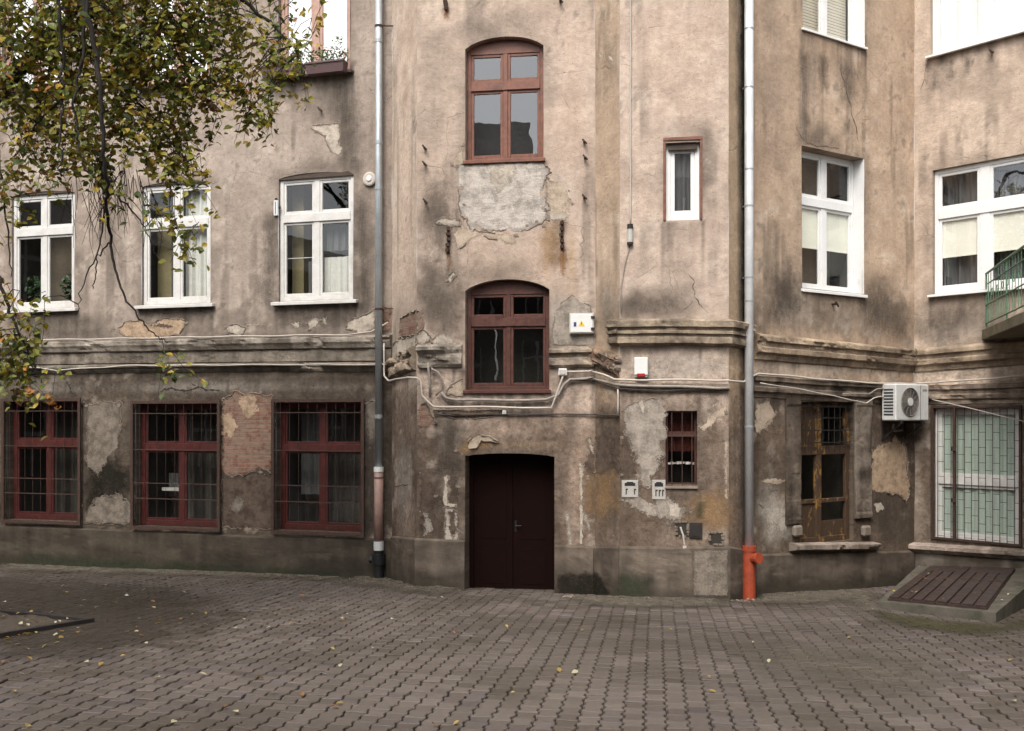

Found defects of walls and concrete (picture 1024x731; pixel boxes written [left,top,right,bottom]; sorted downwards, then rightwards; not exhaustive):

peeling [311,123,342,156]
crack [796,68,858,149]
peeling [434,143,573,249]
spalling [113,317,188,338]
spalling [345,306,456,357]
peeling [83,399,123,478]
peeling [81,492,130,526]
spalling [220,390,276,530]
peeling [453,434,500,455]
peeling [566,397,729,596]
spalling [871,436,910,512]